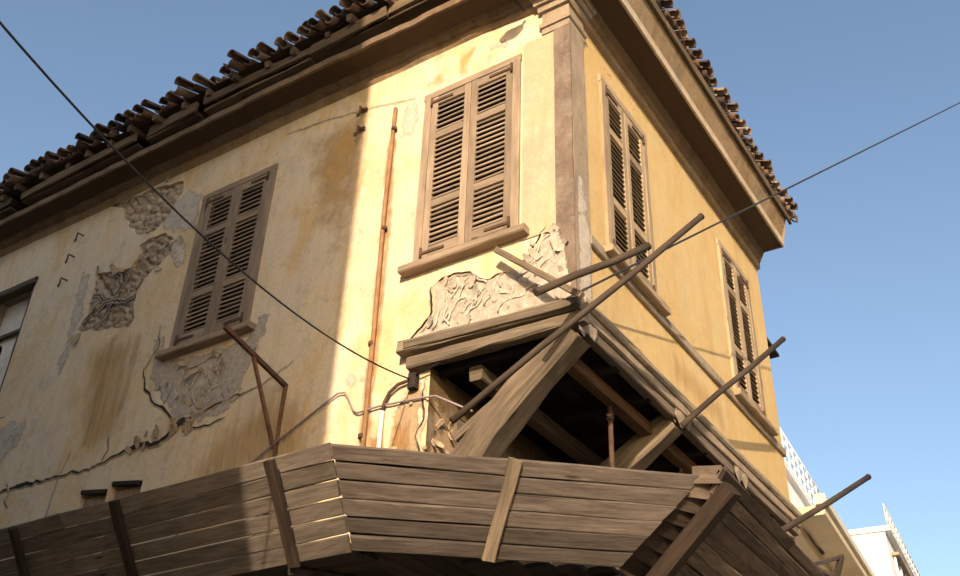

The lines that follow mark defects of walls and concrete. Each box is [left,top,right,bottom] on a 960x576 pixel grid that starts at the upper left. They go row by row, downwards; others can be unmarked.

spalling [58,175,202,375]
rust [384,140,396,240]
peeling [411,176,592,338]
crack [0,325,294,517]
peeling [150,314,269,423]